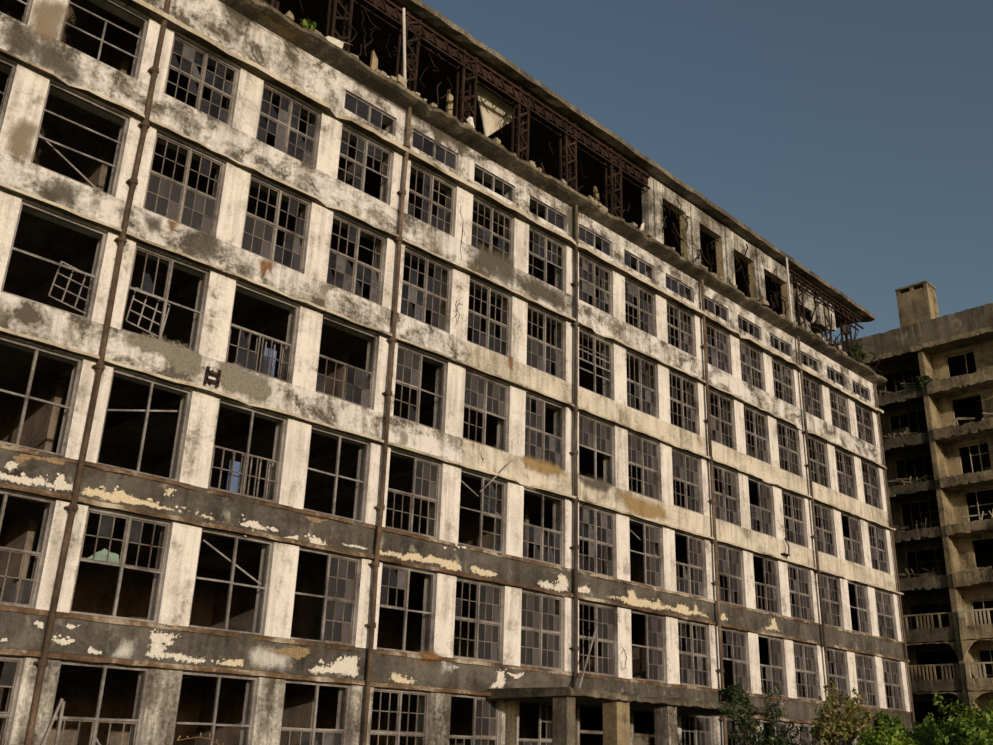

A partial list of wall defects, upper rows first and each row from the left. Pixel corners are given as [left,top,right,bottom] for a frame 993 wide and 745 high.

peeling [0,454,216,520]
peeling [379,536,497,577]
peeling [606,590,709,618]
peeling [145,629,244,667]
peeling [269,646,360,679]